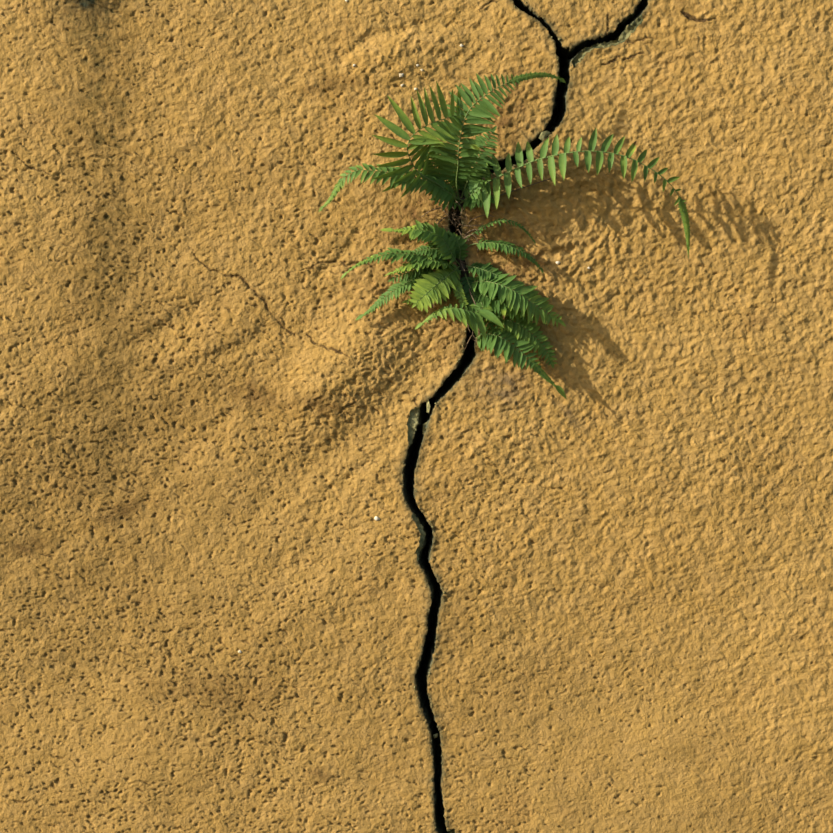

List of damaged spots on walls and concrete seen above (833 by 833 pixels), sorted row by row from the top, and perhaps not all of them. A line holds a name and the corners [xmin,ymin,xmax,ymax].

crack [448,0,650,238]
crack [402,324,478,833]